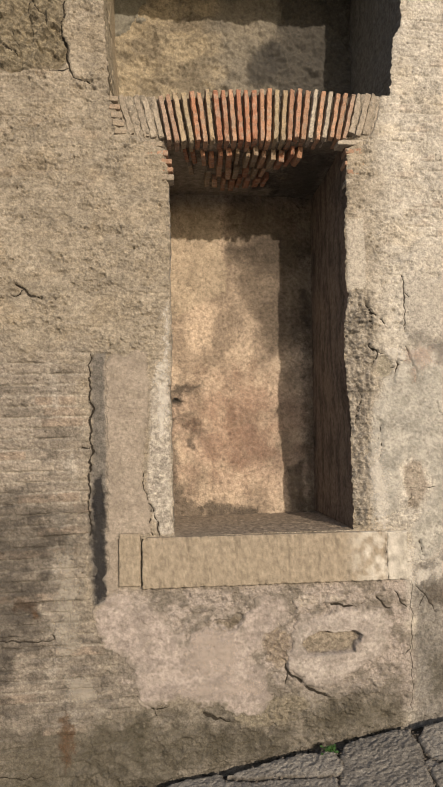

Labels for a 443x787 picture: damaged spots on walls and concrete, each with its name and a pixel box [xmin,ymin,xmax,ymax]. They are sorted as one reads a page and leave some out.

crack [28,0,90,84]
crack [11,284,42,299]
crack [365,275,416,378]
water stain [93,475,104,515]
water stain [367,450,388,528]
water stain [407,547,443,585]
crack [283,659,329,697]
crack [330,581,437,710]